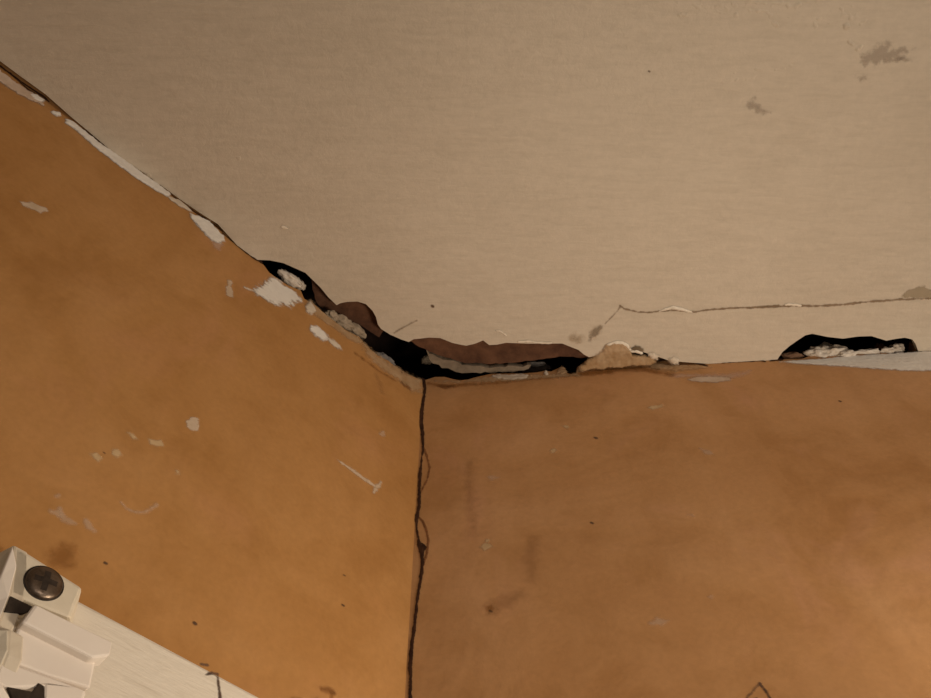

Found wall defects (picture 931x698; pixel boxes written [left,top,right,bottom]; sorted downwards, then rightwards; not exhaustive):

spalling [260,260,705,391]
crack [590,287,931,340]
spalling [778,334,912,360]
crack [408,378,431,698]